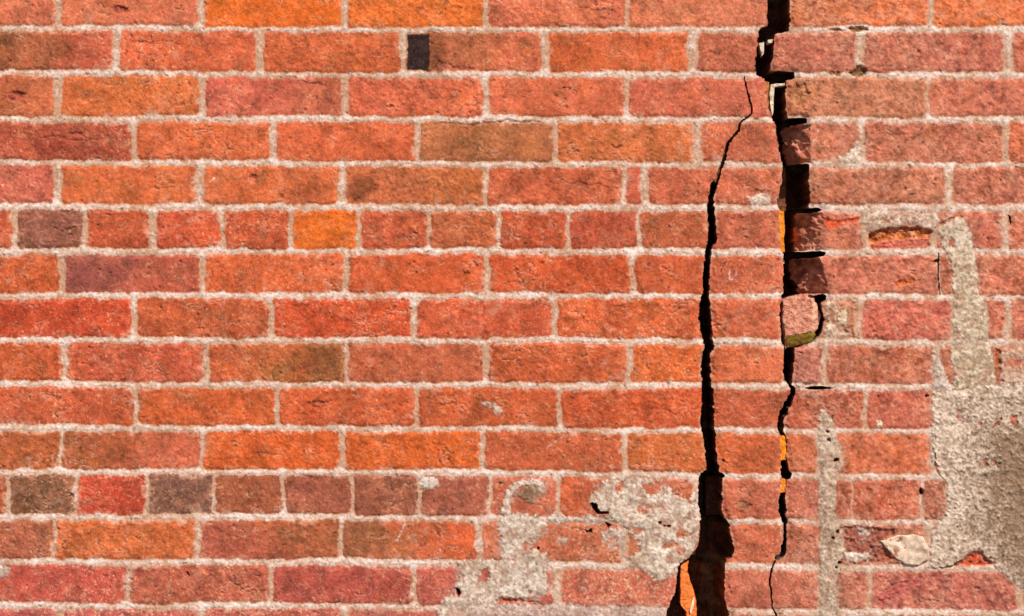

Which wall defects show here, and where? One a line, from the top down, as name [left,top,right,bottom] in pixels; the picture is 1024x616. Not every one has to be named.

spalling [868,217,955,251]
crack [666,0,834,616]
peeling [925,348,952,398]
peeling [547,502,624,551]
spalling [959,551,994,567]
spalling [496,597,538,605]